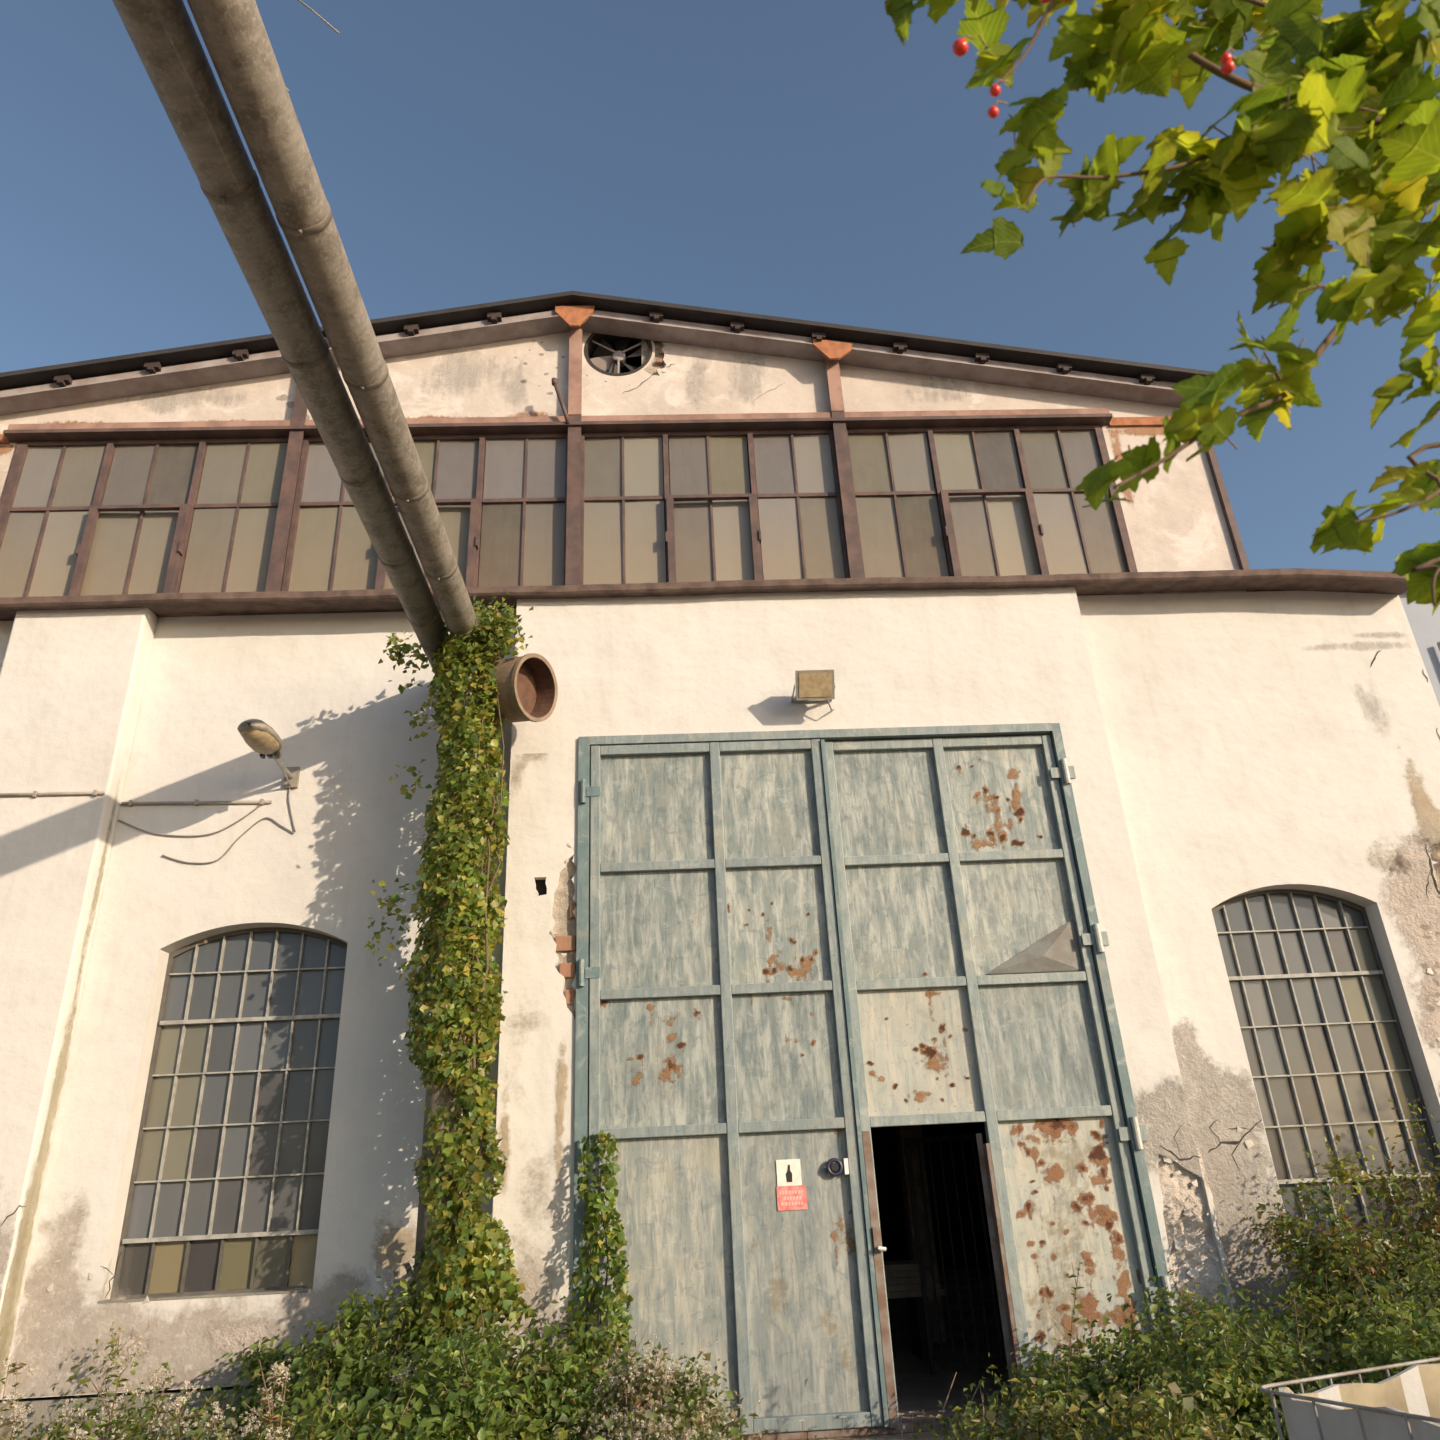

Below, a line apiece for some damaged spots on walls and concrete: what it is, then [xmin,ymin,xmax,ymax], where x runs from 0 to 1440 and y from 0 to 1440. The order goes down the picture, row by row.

spalling [535,843,577,1018]
corrosion [744,902,828,1001]
corrosion [961,769,1043,851]
peeling [1387,835,1440,1047]
crack [1425,844,1440,899]
corrosion [866,972,970,1103]
water stain [0,1235,9,1274]
water stain [5,1209,372,1398]
water stain [375,1225,416,1328]
corrosion [1010,1118,1142,1363]
crack [1160,1119,1262,1171]
peeling [1135,1024,1304,1337]